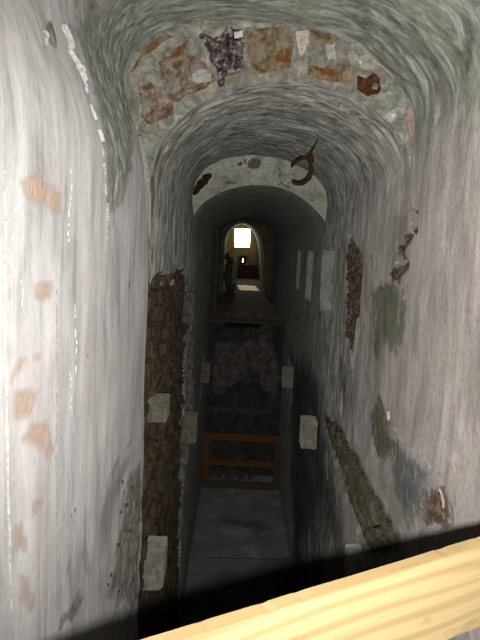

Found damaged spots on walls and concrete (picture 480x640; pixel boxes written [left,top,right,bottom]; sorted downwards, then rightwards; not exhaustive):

peeling [42,0,294,240]
rust [343,66,381,96]
spalling [345,238,362,370]
spalling [380,222,418,290]
spalling [107,269,196,640]
spalling [418,487,453,531]